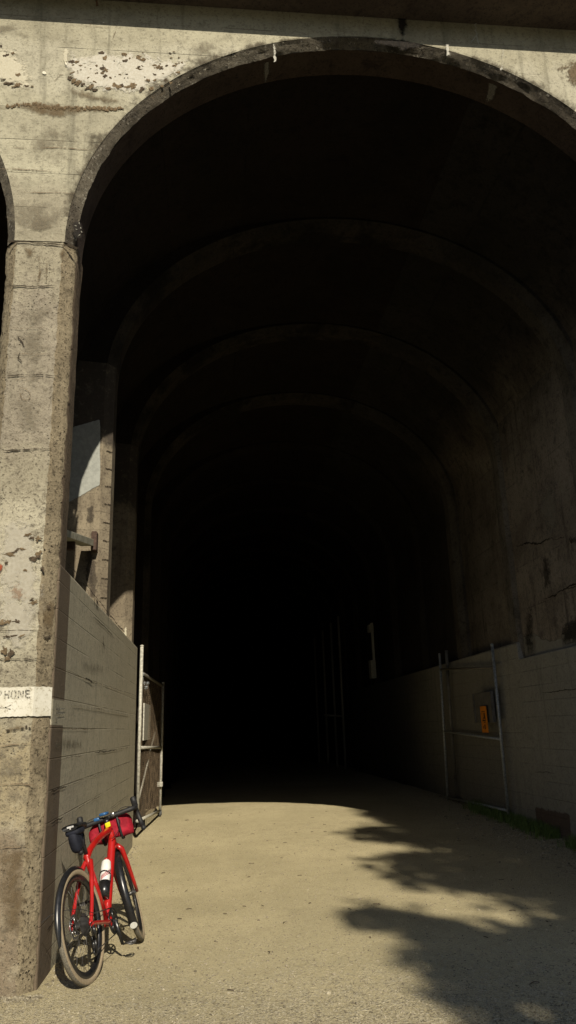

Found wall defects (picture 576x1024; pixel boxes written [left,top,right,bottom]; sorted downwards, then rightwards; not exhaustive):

peeling [63,46,185,93]
peeling [0,520,54,661]